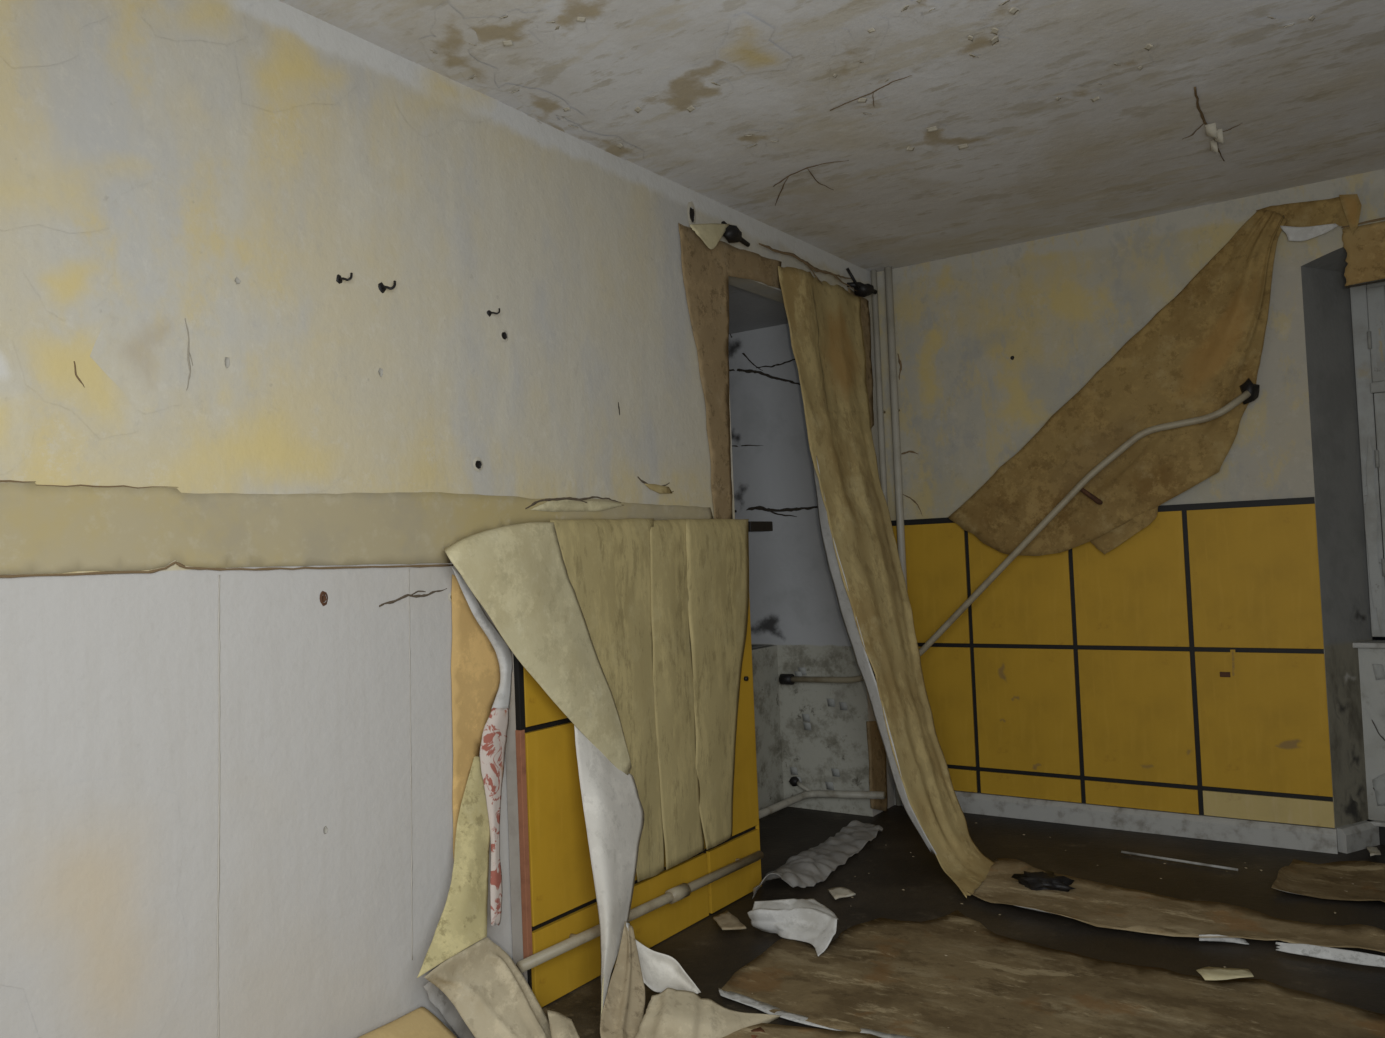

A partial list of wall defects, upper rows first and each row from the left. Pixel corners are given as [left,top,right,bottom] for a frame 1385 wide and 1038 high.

water stain [392,61,502,137]
crack [1183,87,1242,161]
crack [773,160,849,205]
spalling [778,655,821,692]
flaking render [828,887,856,900]